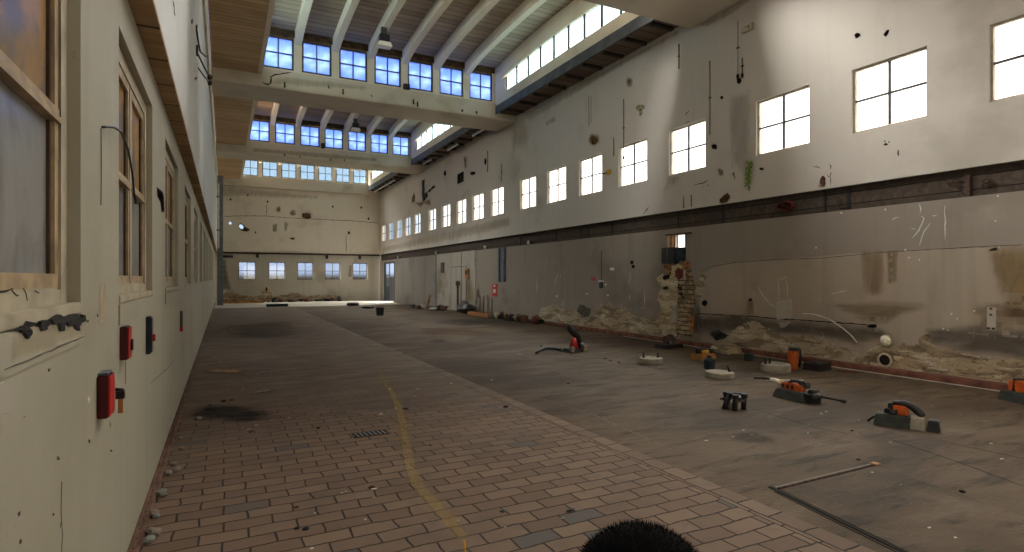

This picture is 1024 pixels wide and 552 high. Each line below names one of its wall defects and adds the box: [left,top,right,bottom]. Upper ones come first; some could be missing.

spalling [539,261,696,337]
spalling [728,300,1024,384]